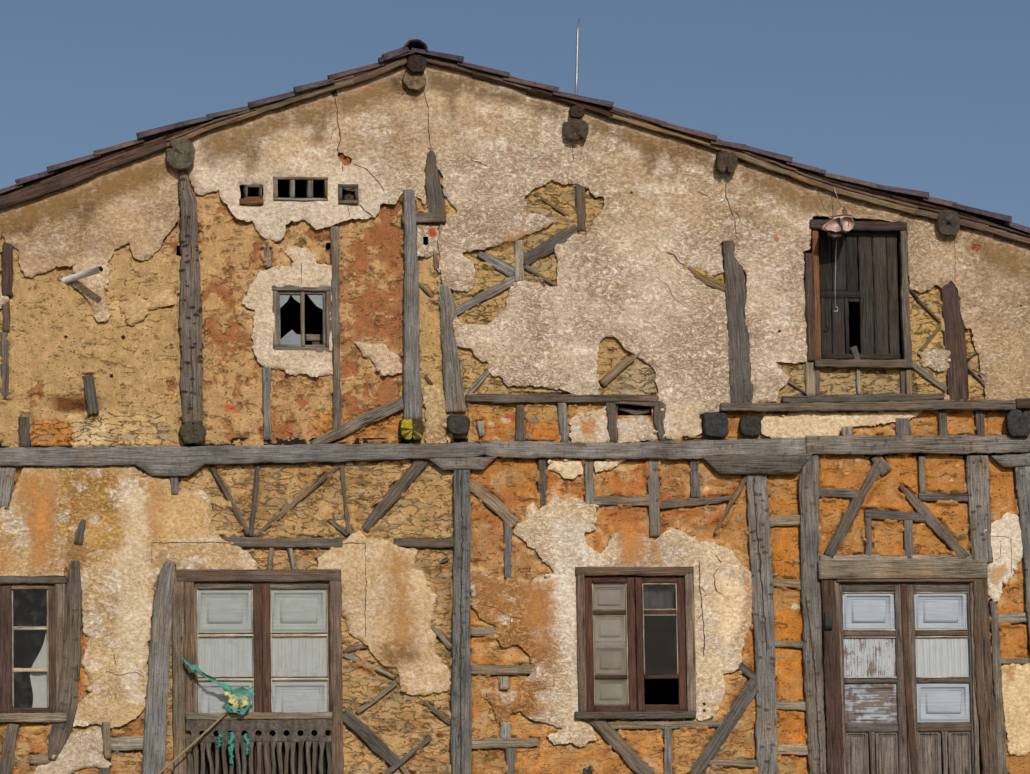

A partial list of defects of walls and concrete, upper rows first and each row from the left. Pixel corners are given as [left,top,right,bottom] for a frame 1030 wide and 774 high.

crack [331,99,384,190]
spalling [0,172,604,448]
spalling [458,337,703,443]
peeling [547,459,626,479]
peeling [984,512,1024,602]
peeling [0,465,258,774]
peeling [317,530,451,696]
peeling [470,495,753,747]
peeling [1001,663,1030,756]